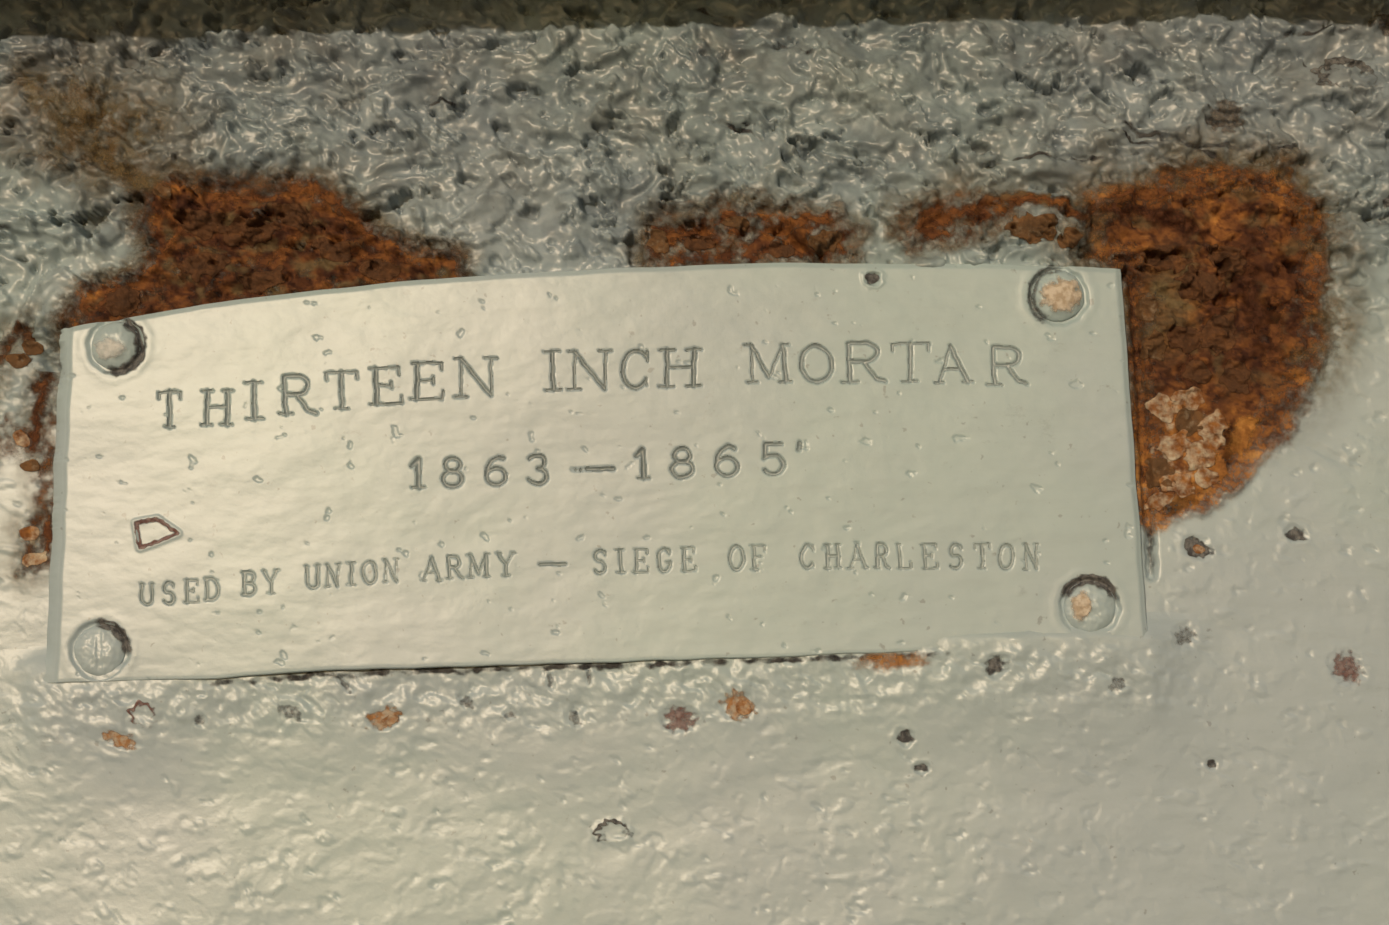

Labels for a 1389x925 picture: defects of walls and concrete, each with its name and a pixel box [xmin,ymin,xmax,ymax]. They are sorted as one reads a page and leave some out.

rust [16,73,468,335]
rust [637,193,867,267]
rust [890,150,1353,531]
rust [0,321,57,574]
peeling [1184,536,1214,558]
rust [863,653,924,669]
peeling [1333,652,1360,682]